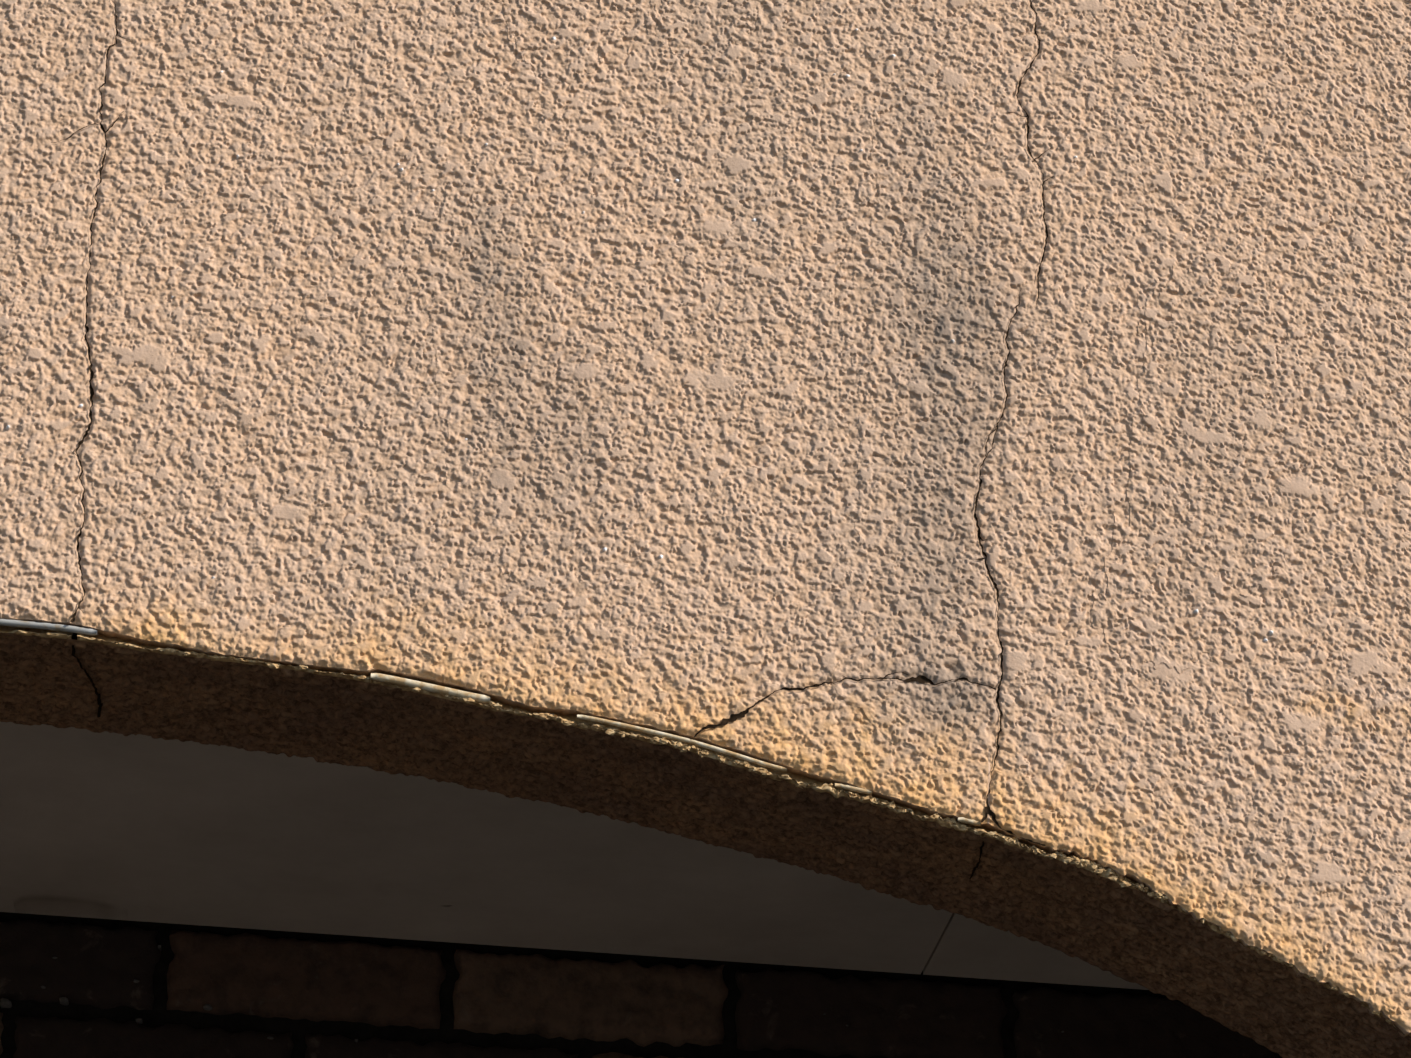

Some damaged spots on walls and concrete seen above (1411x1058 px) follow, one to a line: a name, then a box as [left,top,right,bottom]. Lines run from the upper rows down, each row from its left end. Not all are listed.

crack [51,1,125,717]
crack [694,0,1054,879]